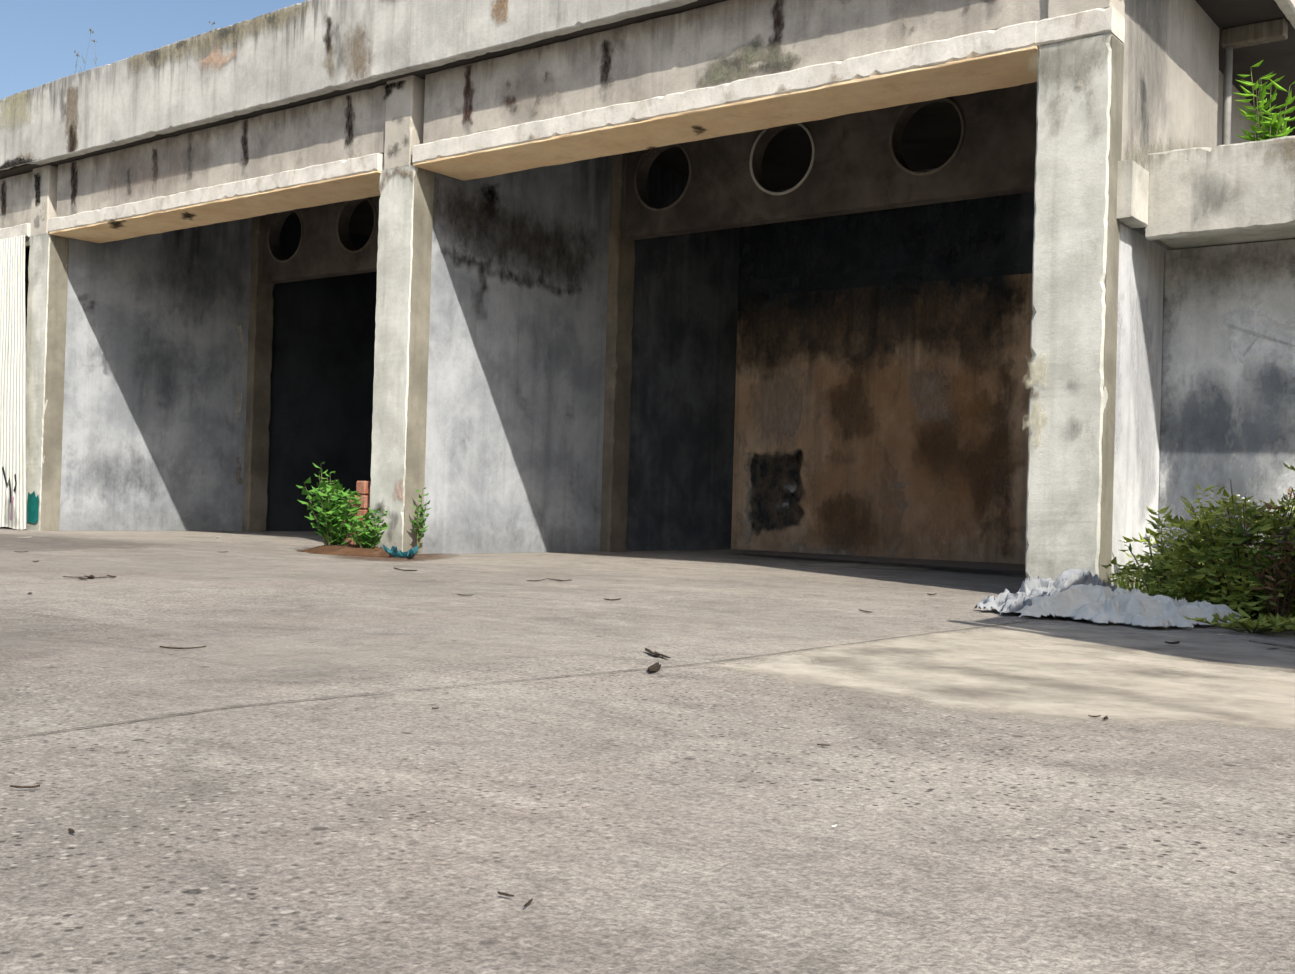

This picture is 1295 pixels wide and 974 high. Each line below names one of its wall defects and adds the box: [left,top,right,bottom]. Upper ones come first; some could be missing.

rust [324,17,333,75]
rust [492,0,508,22]
water stain [61,87,78,152]
water stain [433,190,592,282]
water stain [743,372,808,535]
water stain [1115,297,1295,560]
water stain [734,454,1013,575]